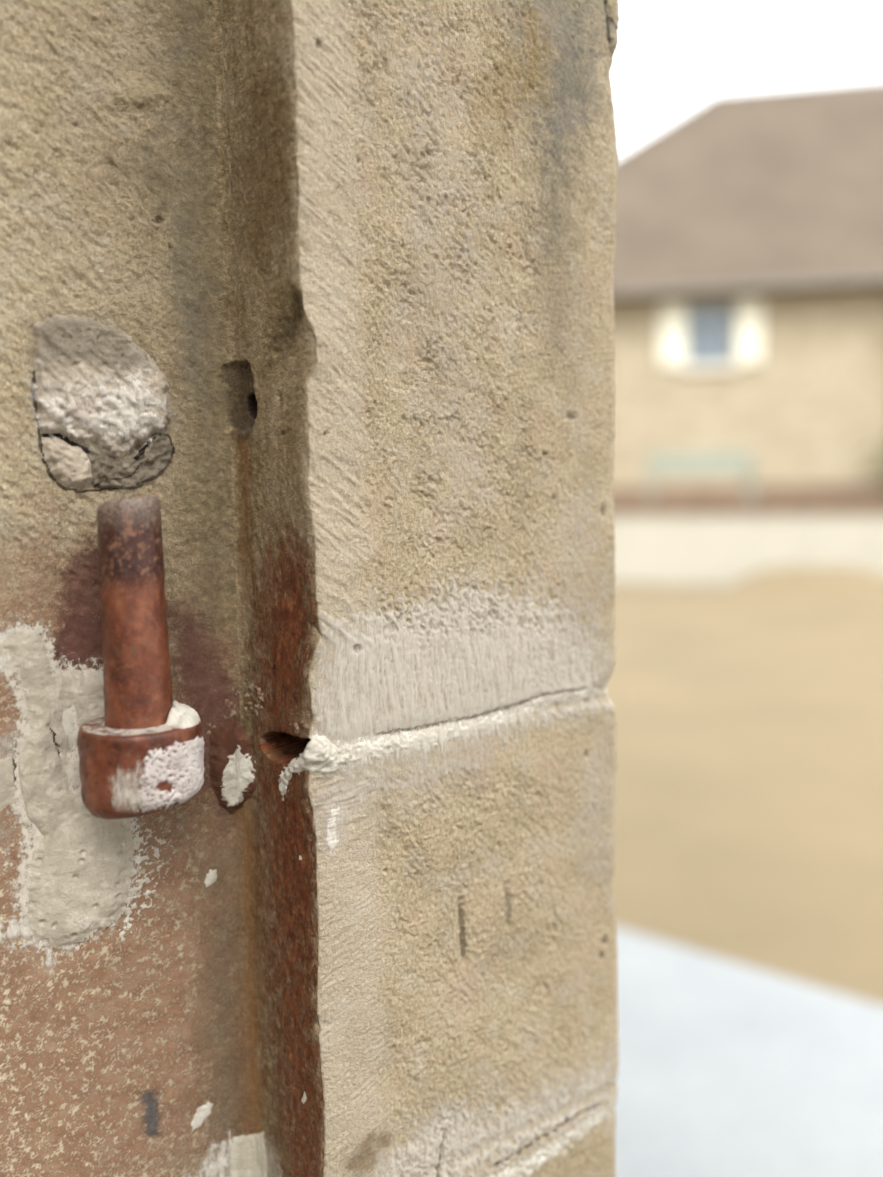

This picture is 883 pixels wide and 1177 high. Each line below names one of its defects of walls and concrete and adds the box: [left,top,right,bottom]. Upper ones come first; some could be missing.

crack [383,690,580,735]
spalling [267,731,310,759]
rust [0,527,325,1177]